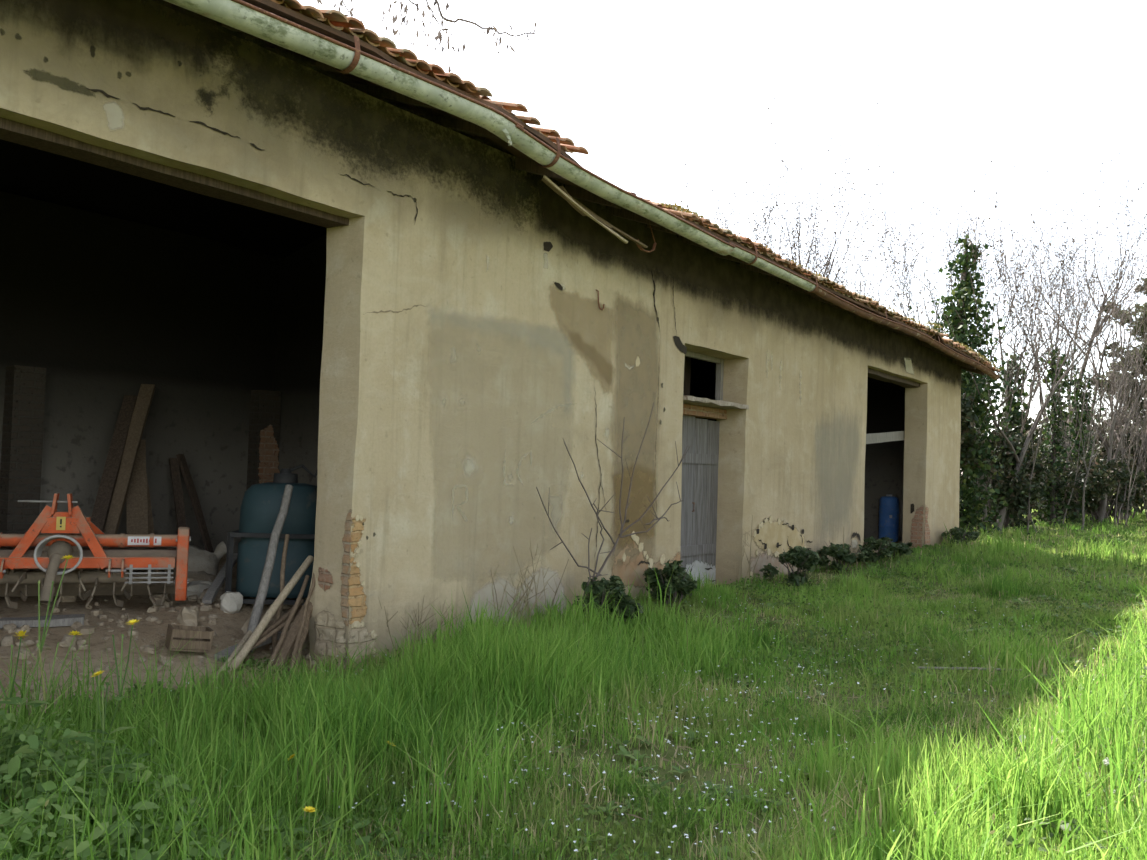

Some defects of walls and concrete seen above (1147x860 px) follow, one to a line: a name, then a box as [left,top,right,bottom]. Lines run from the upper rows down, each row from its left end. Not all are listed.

leakage [0,0,962,386]
crack [652,277,677,337]
spalling [258,424,280,483]
leakage [612,297,658,563]
spalling [314,510,377,669]
peeling [750,515,816,581]